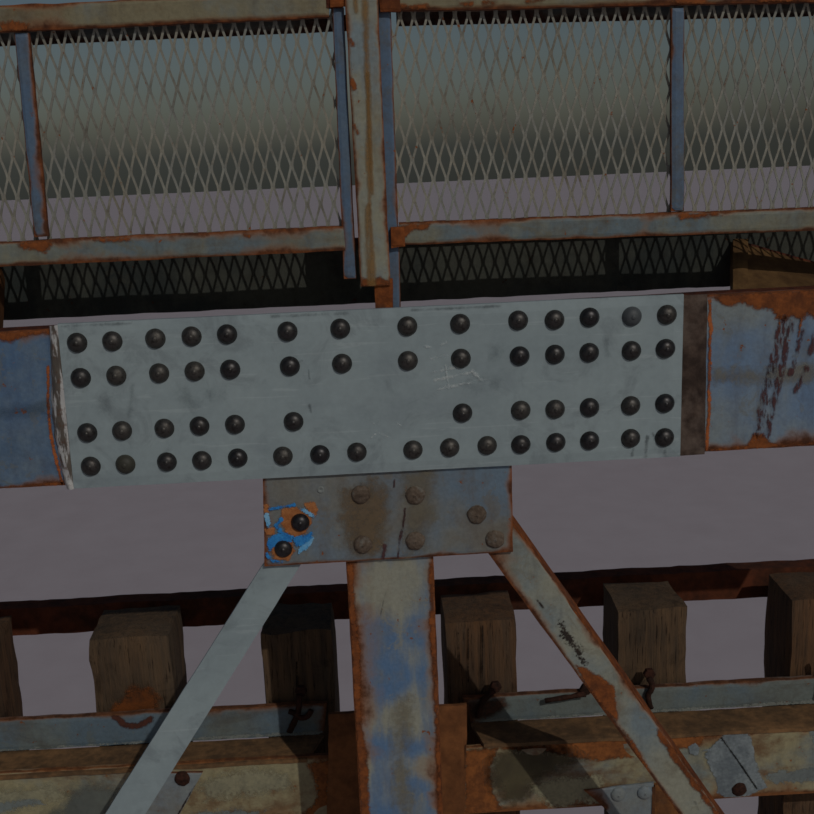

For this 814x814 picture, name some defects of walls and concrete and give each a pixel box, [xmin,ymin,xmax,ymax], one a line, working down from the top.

corrosion [350,0,389,286]
corrosion [705,291,814,451]
peeling [263,502,318,564]
corrosion [347,564,370,814]
corrosion [428,563,442,814]
corrosion [558,619,618,720]
corrosion [465,734,648,813]
corrosion [657,728,719,814]